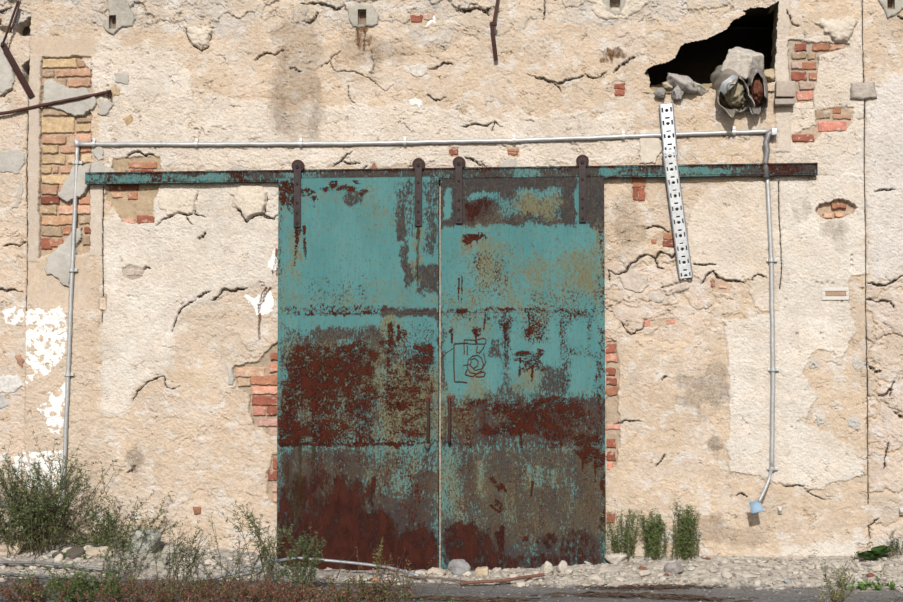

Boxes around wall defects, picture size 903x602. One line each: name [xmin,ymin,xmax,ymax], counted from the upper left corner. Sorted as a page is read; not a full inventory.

crack [528,57,635,93]
spalling [787,40,853,144]
spalling [37,56,93,259]
peeling [2,305,67,384]
crack [172,288,247,332]
spalling [234,340,278,436]
corrosion [462,234,482,247]
corrosion [501,308,544,381]
crack [608,182,782,289]
spalling [815,199,856,219]
crack [862,0,902,539]
corrosion [277,322,605,585]